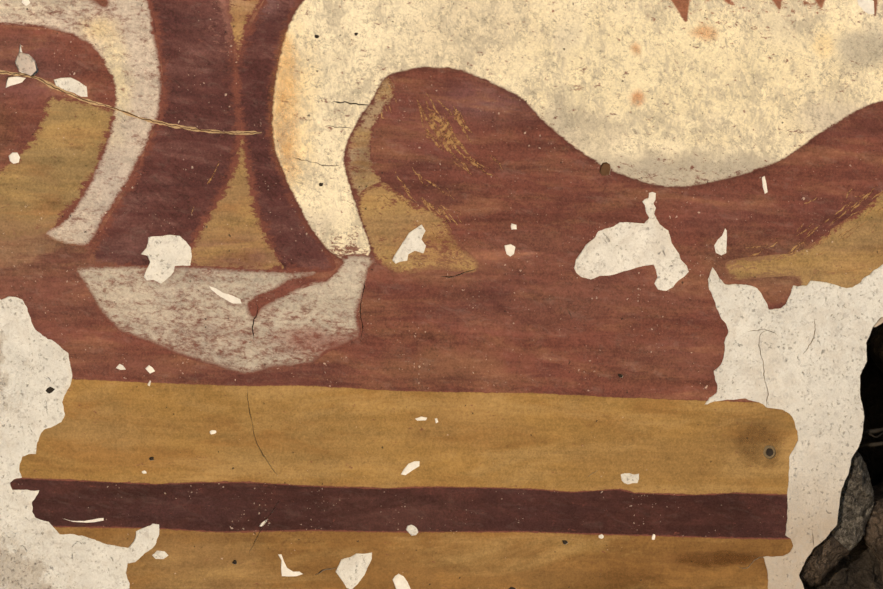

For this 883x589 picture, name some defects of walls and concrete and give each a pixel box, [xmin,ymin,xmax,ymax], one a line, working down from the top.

peeling [141,235,192,283]
peeling [392,225,426,264]
peeling [574,192,689,291]
peeling [714,229,727,255]
peeling [0,296,168,589]
peeling [705,264,883,589]
peeling [336,553,372,589]